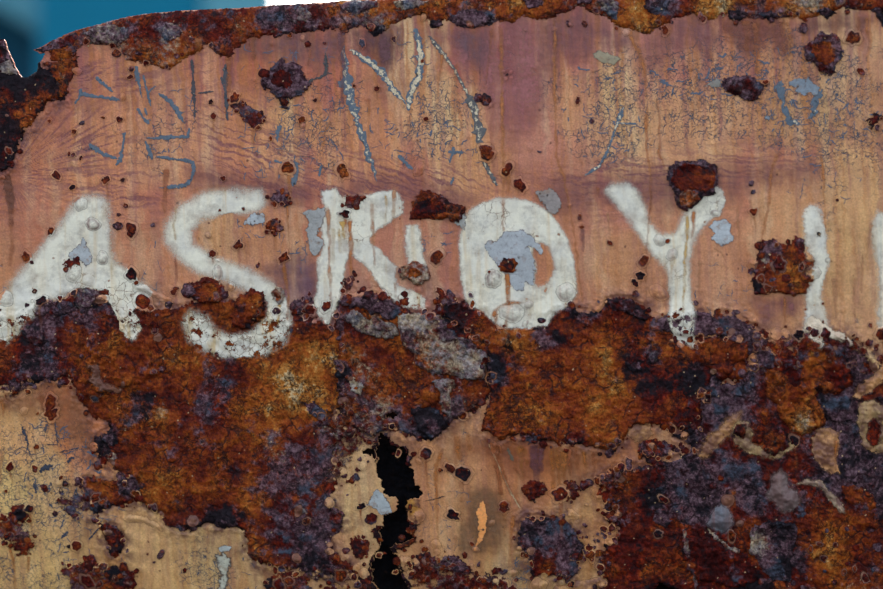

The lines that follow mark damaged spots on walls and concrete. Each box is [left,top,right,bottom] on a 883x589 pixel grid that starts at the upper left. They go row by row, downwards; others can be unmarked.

crack [227,31,483,181]
rust [0,0,883,212]
crack [561,48,883,203]
peeling [303,207,325,256]
peeling [485,229,544,292]
rust [554,130,700,267]
rust [0,159,883,589]
crack [2,420,125,564]
peeling [367,489,392,515]